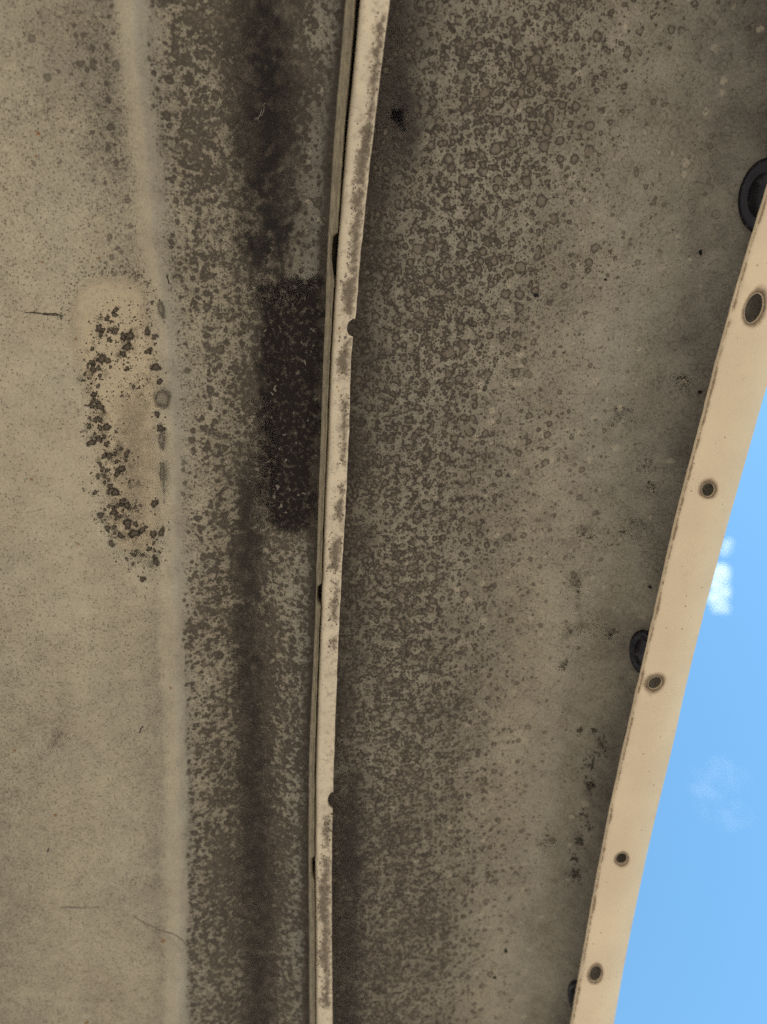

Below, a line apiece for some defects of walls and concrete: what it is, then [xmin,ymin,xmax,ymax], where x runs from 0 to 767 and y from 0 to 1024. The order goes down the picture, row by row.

damp [236,0,385,593]
damp [67,280,179,598]
damp [326,484,345,653]
damp [563,727,613,885]
damp [317,810,358,1008]